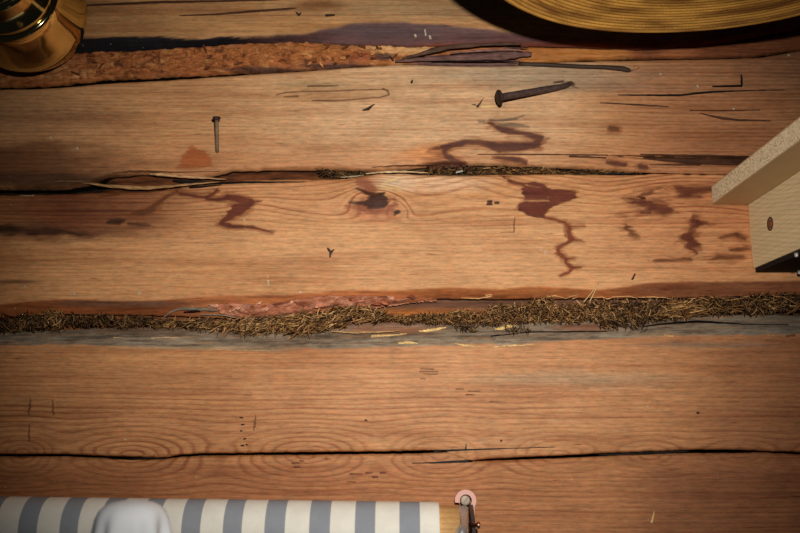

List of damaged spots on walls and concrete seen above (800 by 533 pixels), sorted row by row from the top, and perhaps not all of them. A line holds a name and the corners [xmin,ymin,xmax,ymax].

peeling [302,43,398,68]
leakage [433,118,544,167]
crack [478,154,749,175]
crack [173,179,296,188]
leakage [107,189,267,231]
leakage [503,176,576,218]
leakage [631,193,673,214]
leakage [680,216,703,260]
peeling [209,300,325,314]
crack [643,319,788,327]
crack [412,444,548,464]
crack [599,449,687,457]